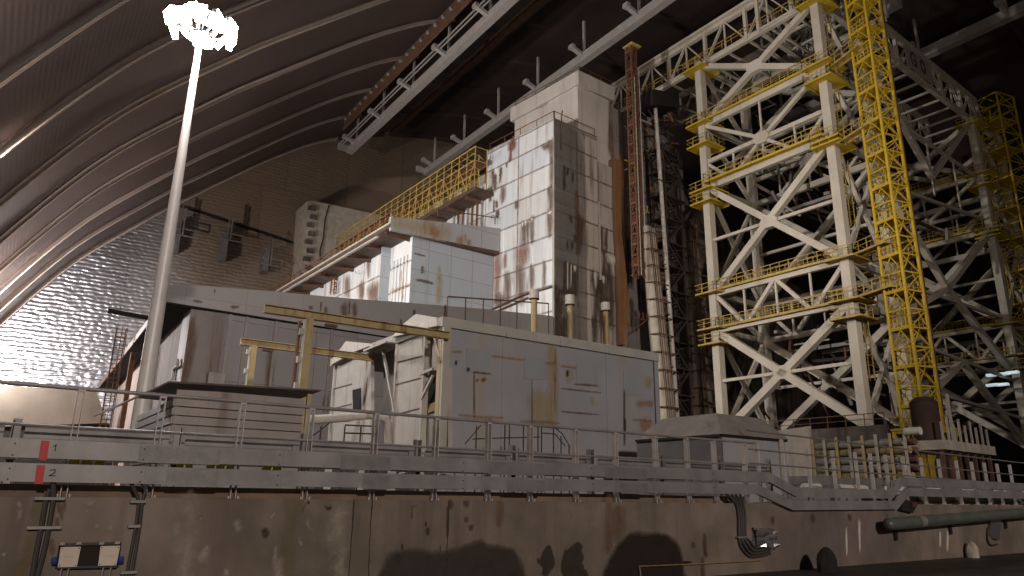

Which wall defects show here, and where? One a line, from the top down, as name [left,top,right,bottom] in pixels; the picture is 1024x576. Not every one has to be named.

corrosion [542,142,552,234]
corrosion [609,101,621,228]
corrosion [342,262,378,315]
corrosion [495,217,545,305]